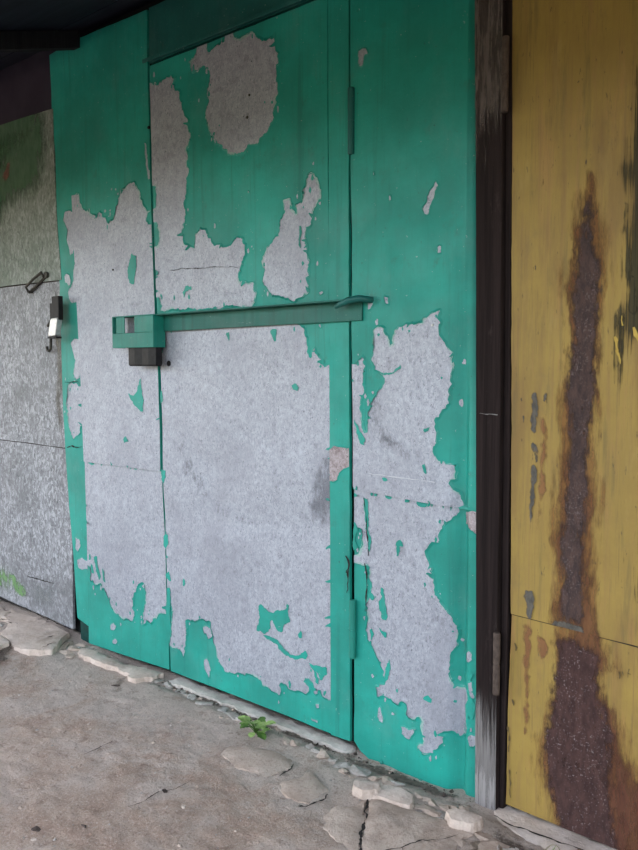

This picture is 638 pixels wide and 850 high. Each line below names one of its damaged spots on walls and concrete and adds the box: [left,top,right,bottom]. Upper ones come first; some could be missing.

peeling [185,30,280,156]
peeling [63,72,476,762]
peeling [521,392,547,433]
peeling [529,443,538,522]
rust [524,174,638,850]
peeling [524,590,534,619]
crack [359,799,369,850]